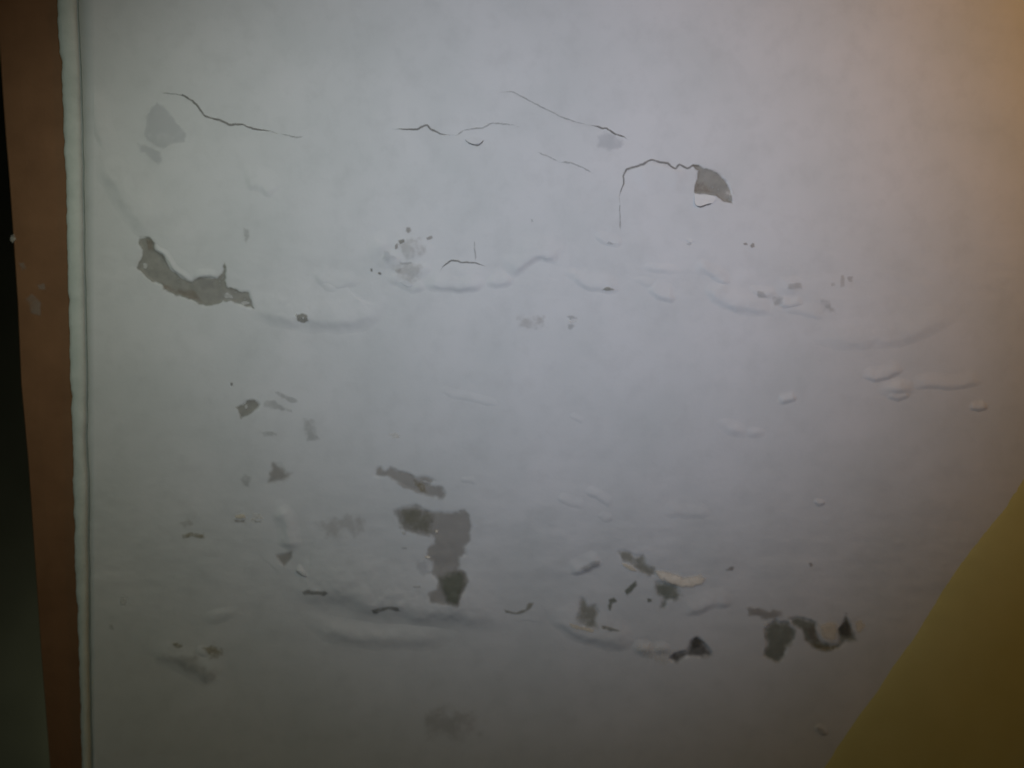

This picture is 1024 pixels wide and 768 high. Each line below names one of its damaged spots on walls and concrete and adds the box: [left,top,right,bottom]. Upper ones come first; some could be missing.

crack [182,95,260,130]
spalling [693,165,732,207]
spalling [137,238,253,307]
peeling [238,401,258,417]
peeling [443,573,464,603]
spalling [622,553,704,601]
spalling [672,639,708,660]
spalling [766,619,863,661]